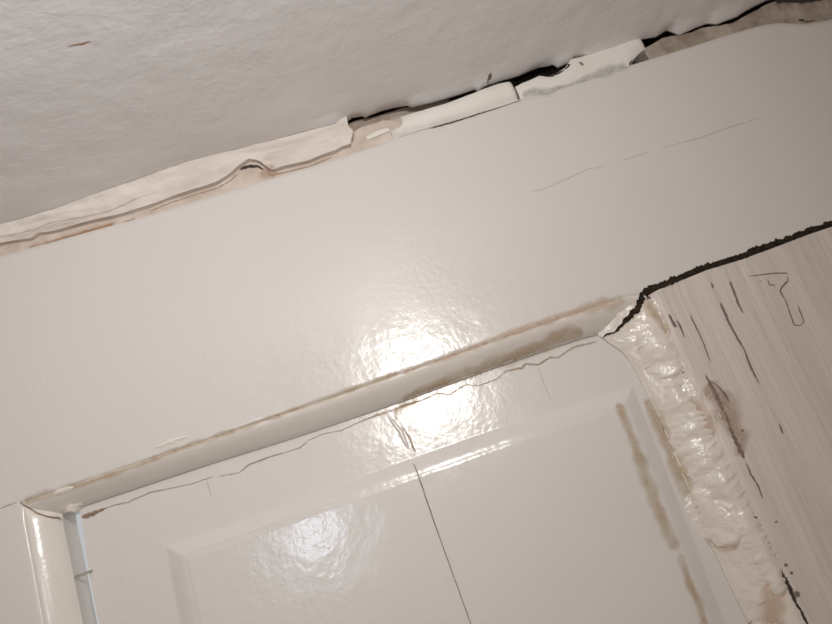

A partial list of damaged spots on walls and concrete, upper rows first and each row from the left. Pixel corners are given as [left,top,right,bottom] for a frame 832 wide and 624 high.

spalling [640,0,832,62]
spalling [348,98,450,150]
crack [603,221,832,383]
crack [0,502,60,519]
crack [388,416,471,624]
crack [782,564,808,624]